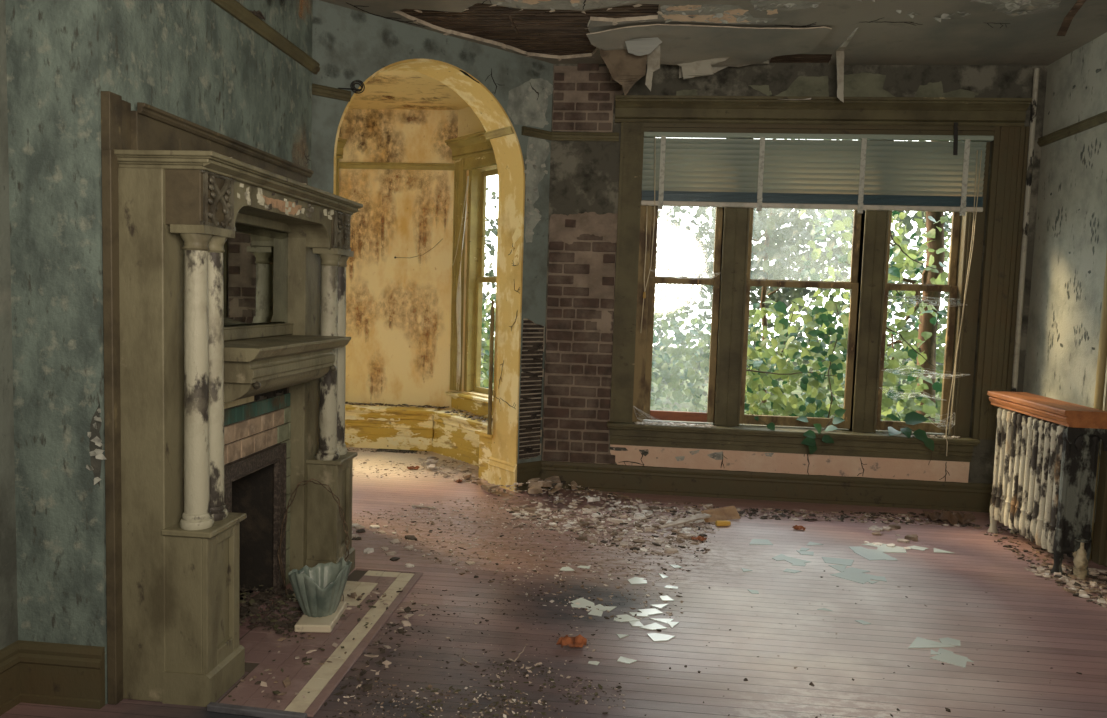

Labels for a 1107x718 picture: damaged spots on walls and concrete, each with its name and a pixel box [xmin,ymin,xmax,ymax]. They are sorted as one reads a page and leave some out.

crack [779,21,821,29]
flaking render [496,59,649,464]
peeling [345,416,430,447]